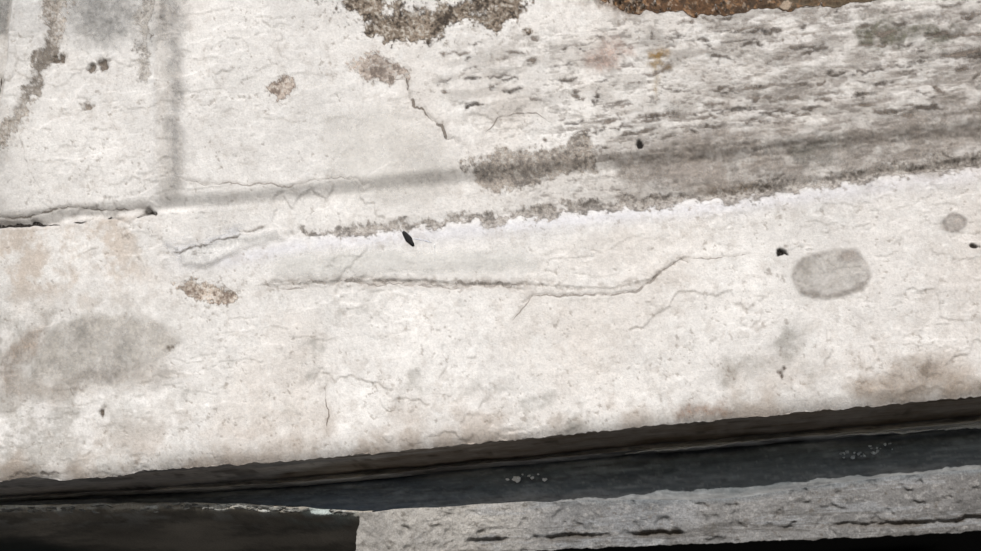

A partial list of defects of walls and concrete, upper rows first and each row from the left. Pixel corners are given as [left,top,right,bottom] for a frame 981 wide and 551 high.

spalling [266,75,296,102]
crack [406,69,447,139]
spalling [335,0,534,93]
spalling [601,0,875,58]
peeling [857,21,928,75]
damp [857,20,947,45]
peeling [941,48,981,79]
spalling [300,69,981,239]
crack [0,206,156,228]
spalling [172,276,238,306]
crack [264,257,720,317]
damp [4,318,173,380]